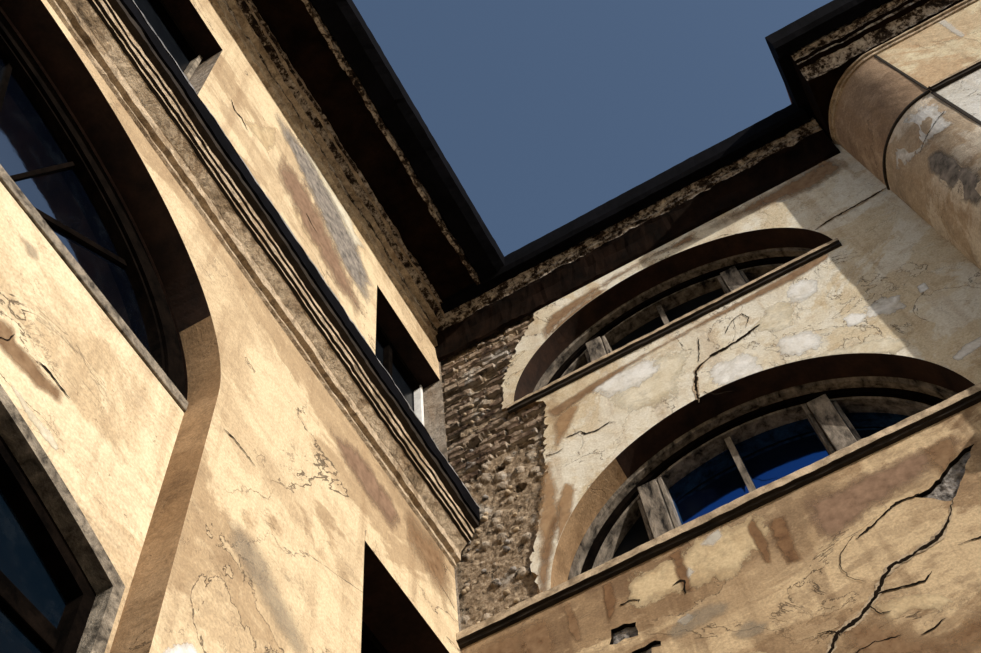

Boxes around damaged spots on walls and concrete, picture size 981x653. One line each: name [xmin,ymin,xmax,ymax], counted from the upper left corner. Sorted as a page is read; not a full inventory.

peeling [896,104,951,166]
leakage [0,320,60,399]
crack [692,313,760,402]
crack [546,422,616,456]
spalling [440,312,547,631]
spalling [915,444,974,501]
peeling [628,516,770,608]
crack [817,493,981,653]
peeling [165,643,197,653]
spalling [609,622,638,645]
spalling [632,640,661,653]